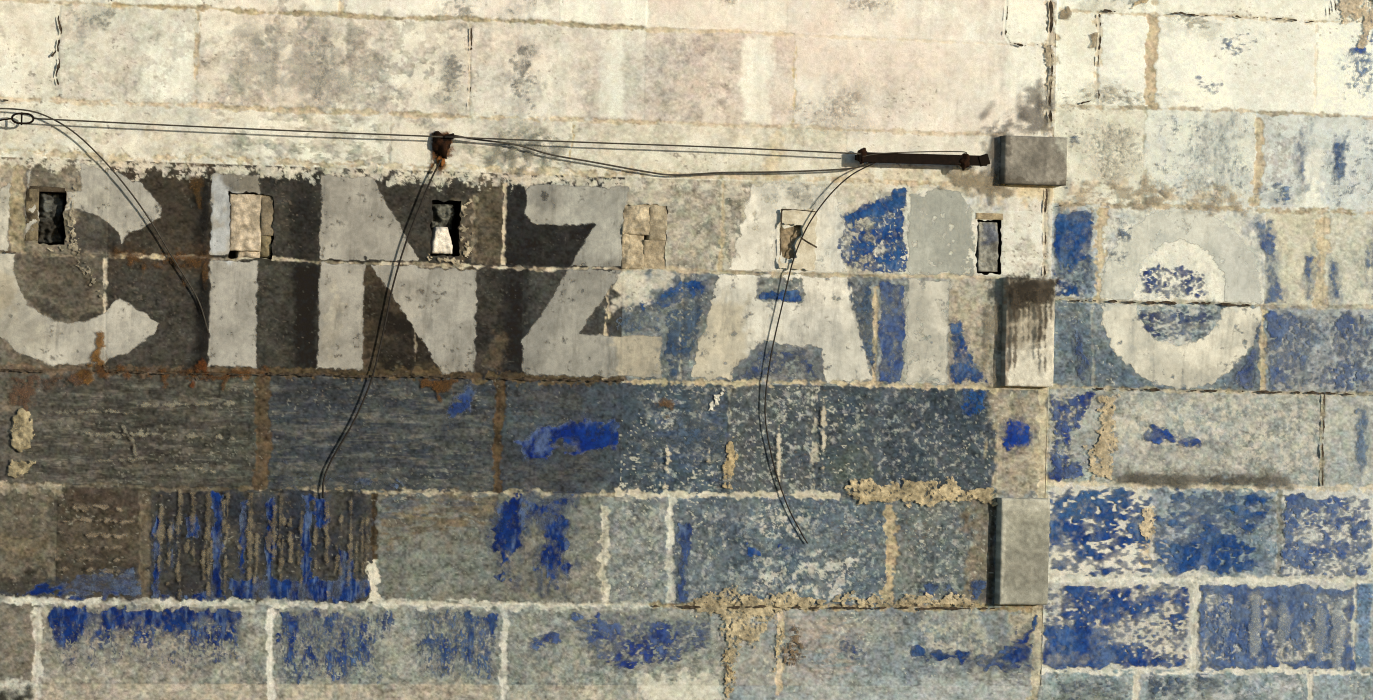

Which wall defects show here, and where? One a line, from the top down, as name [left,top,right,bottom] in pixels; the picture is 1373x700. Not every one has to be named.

rust [431,132,454,175]
water stain [1003,274,1059,369]
rust [10,331,268,411]
peeling [513,417,620,460]
peeling [911,317,1373,700]
peeling [17,475,404,684]